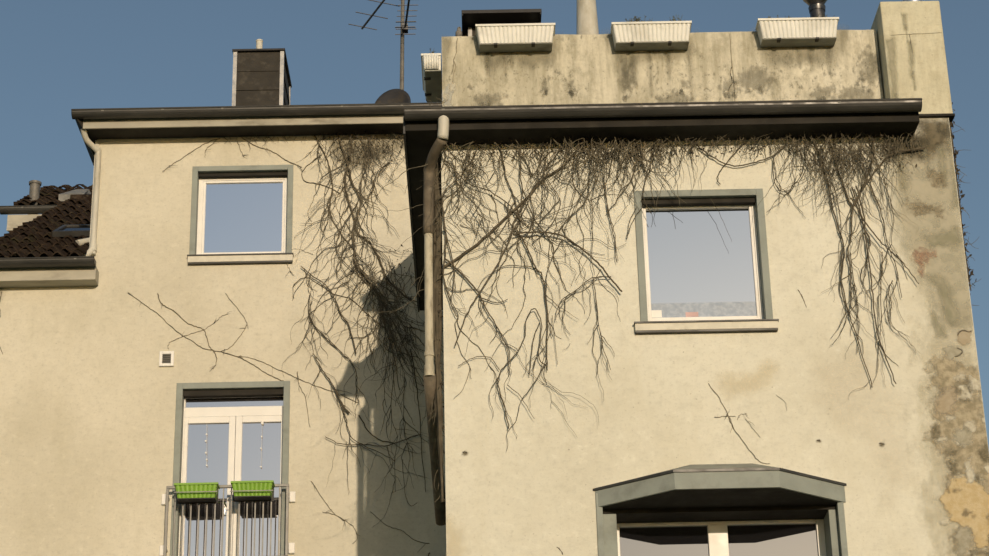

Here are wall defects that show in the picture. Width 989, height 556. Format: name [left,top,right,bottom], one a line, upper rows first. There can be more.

damp [881,118,950,187]
damp [909,203,943,215]
peeling [930,330,989,556]